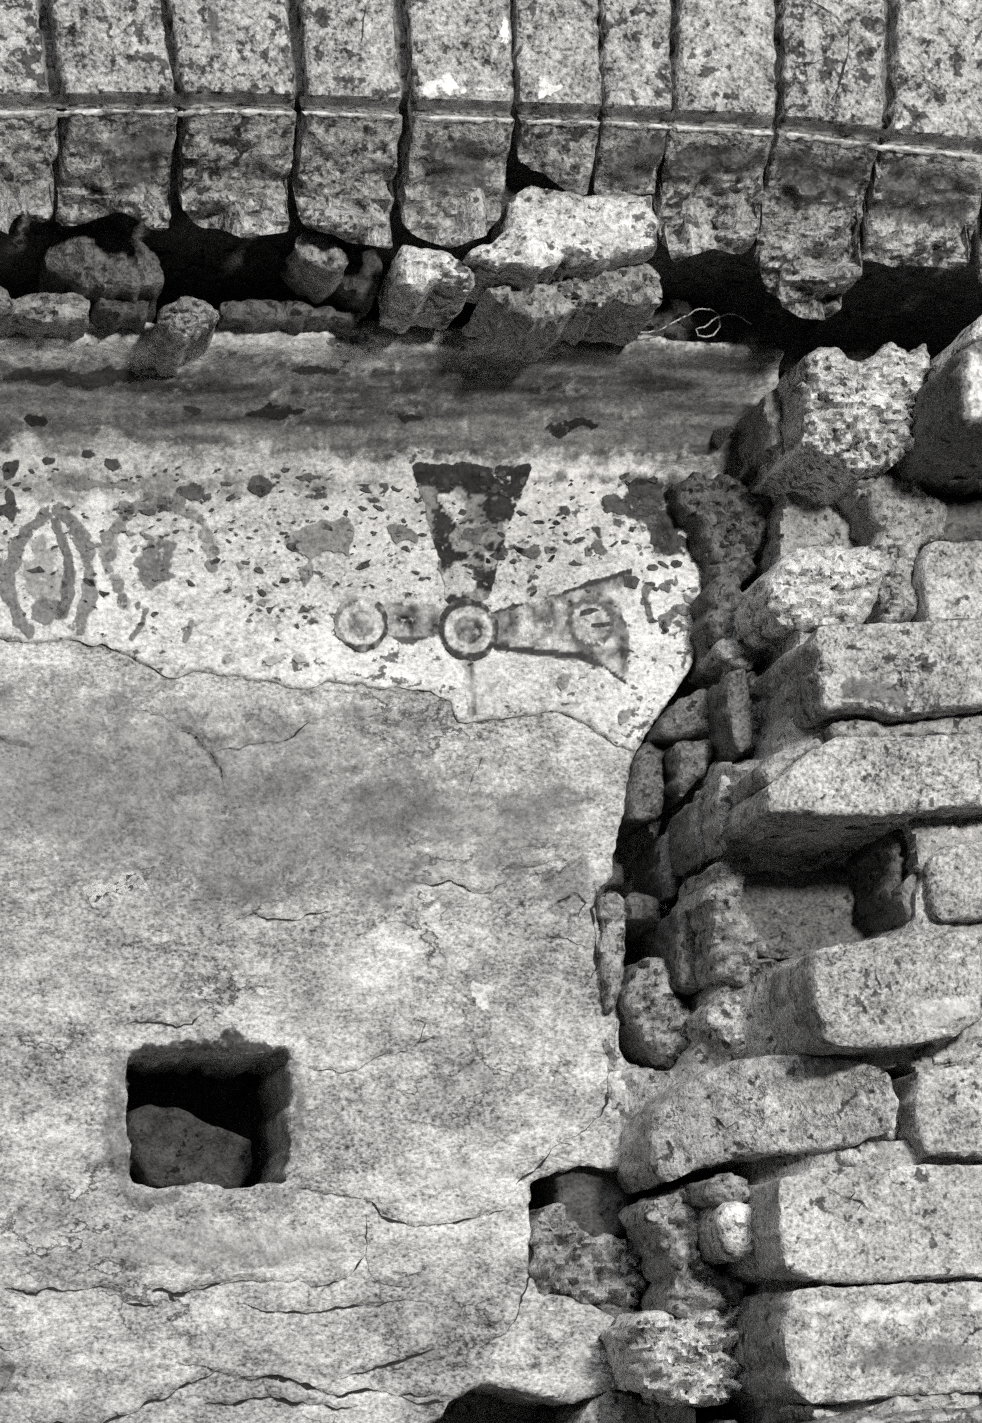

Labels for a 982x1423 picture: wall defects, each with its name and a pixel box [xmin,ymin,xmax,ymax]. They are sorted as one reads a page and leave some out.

peeling [4,365,161,391]
peeling [292,365,340,375]
peeling [25,414,48,426]
peeling [246,402,306,420]
peeling [546,417,599,439]
spalling [841,676,908,708]
peeling [609,696,656,731]
flaking render [594,890,627,1014]
crack [5,1018,617,1314]
crack [480,1232,532,1347]
crack [0,1343,63,1423]
crack [103,1349,447,1423]